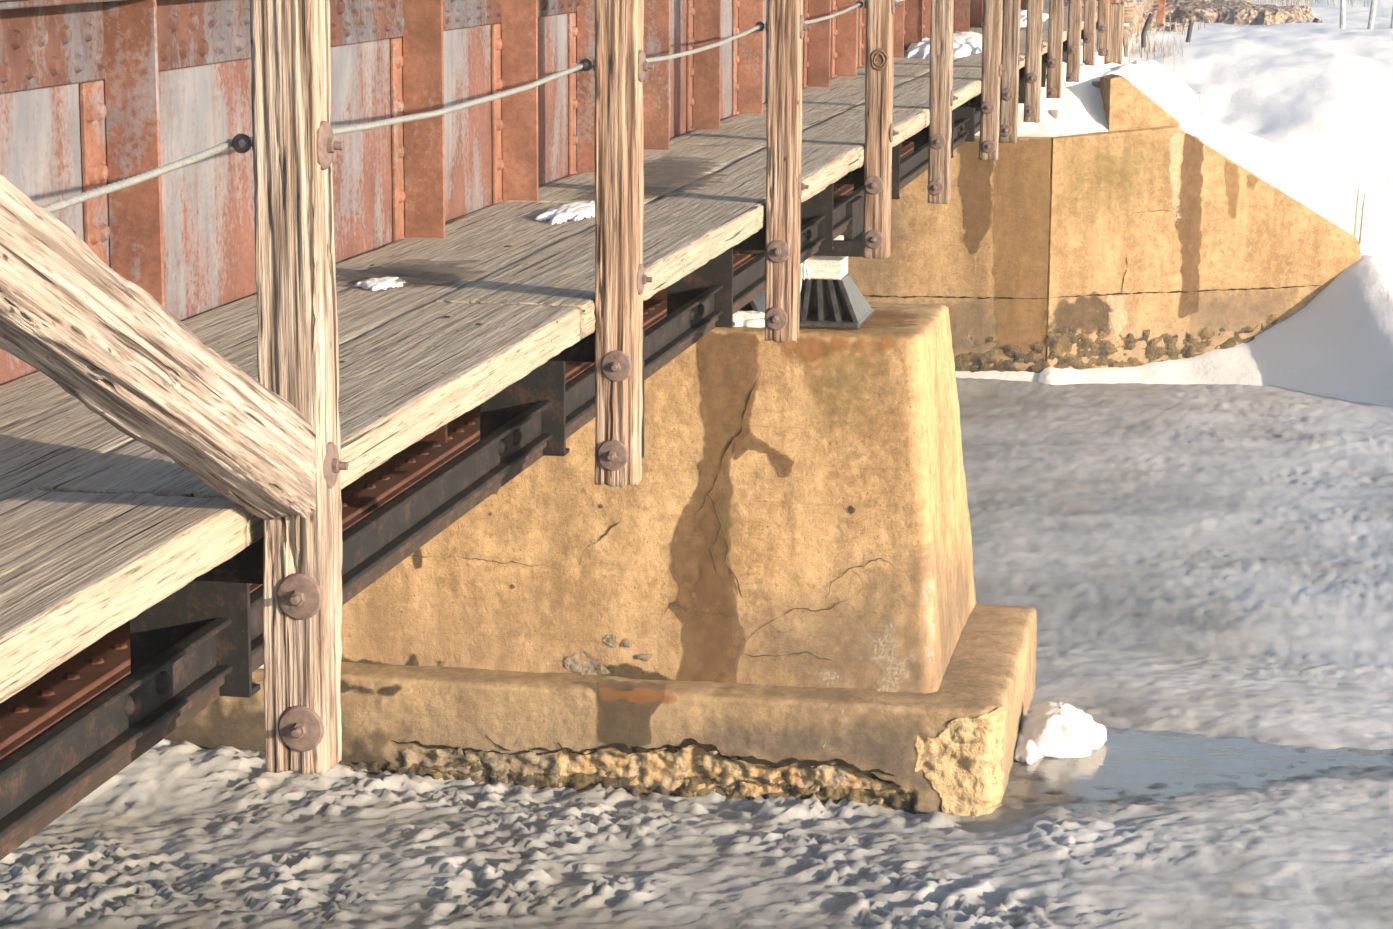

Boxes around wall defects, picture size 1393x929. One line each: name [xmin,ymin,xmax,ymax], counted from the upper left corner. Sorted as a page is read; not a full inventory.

leakage [957,138,1128,356]
leakage [1169,132,1204,318]
rust [800,309,918,360]
crack [664,379,898,665]
leakage [413,548,422,568]
leakage [340,681,401,695]
rust [601,688,676,704]
leakage [164,699,265,752]
leakage [339,741,384,773]
spalling [339,707,1006,816]